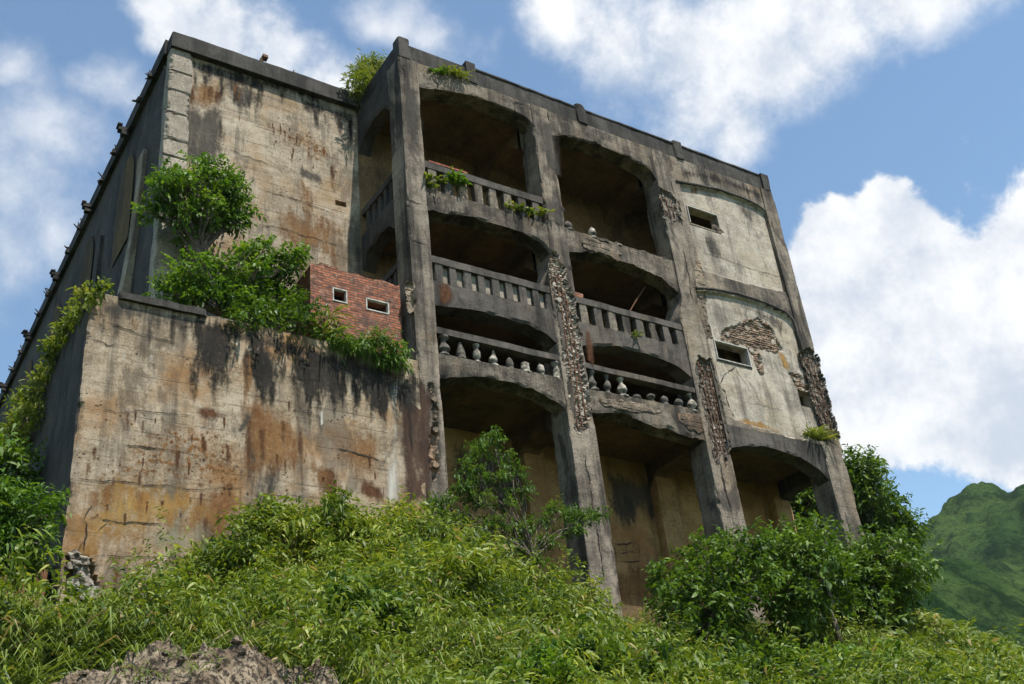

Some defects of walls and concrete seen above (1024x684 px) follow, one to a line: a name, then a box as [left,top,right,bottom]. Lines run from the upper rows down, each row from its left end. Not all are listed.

leakage [187,109,222,164]
rust [190,84,221,109]
leakage [193,62,352,139]
rust [266,124,337,187]
spalling [694,257,780,376]
rust [75,352,341,556]
leakage [100,303,421,424]
rust [337,434,384,499]
leakage [388,453,397,500]
peeling [401,381,440,502]
spalling [678,354,732,467]
spalling [789,347,841,440]